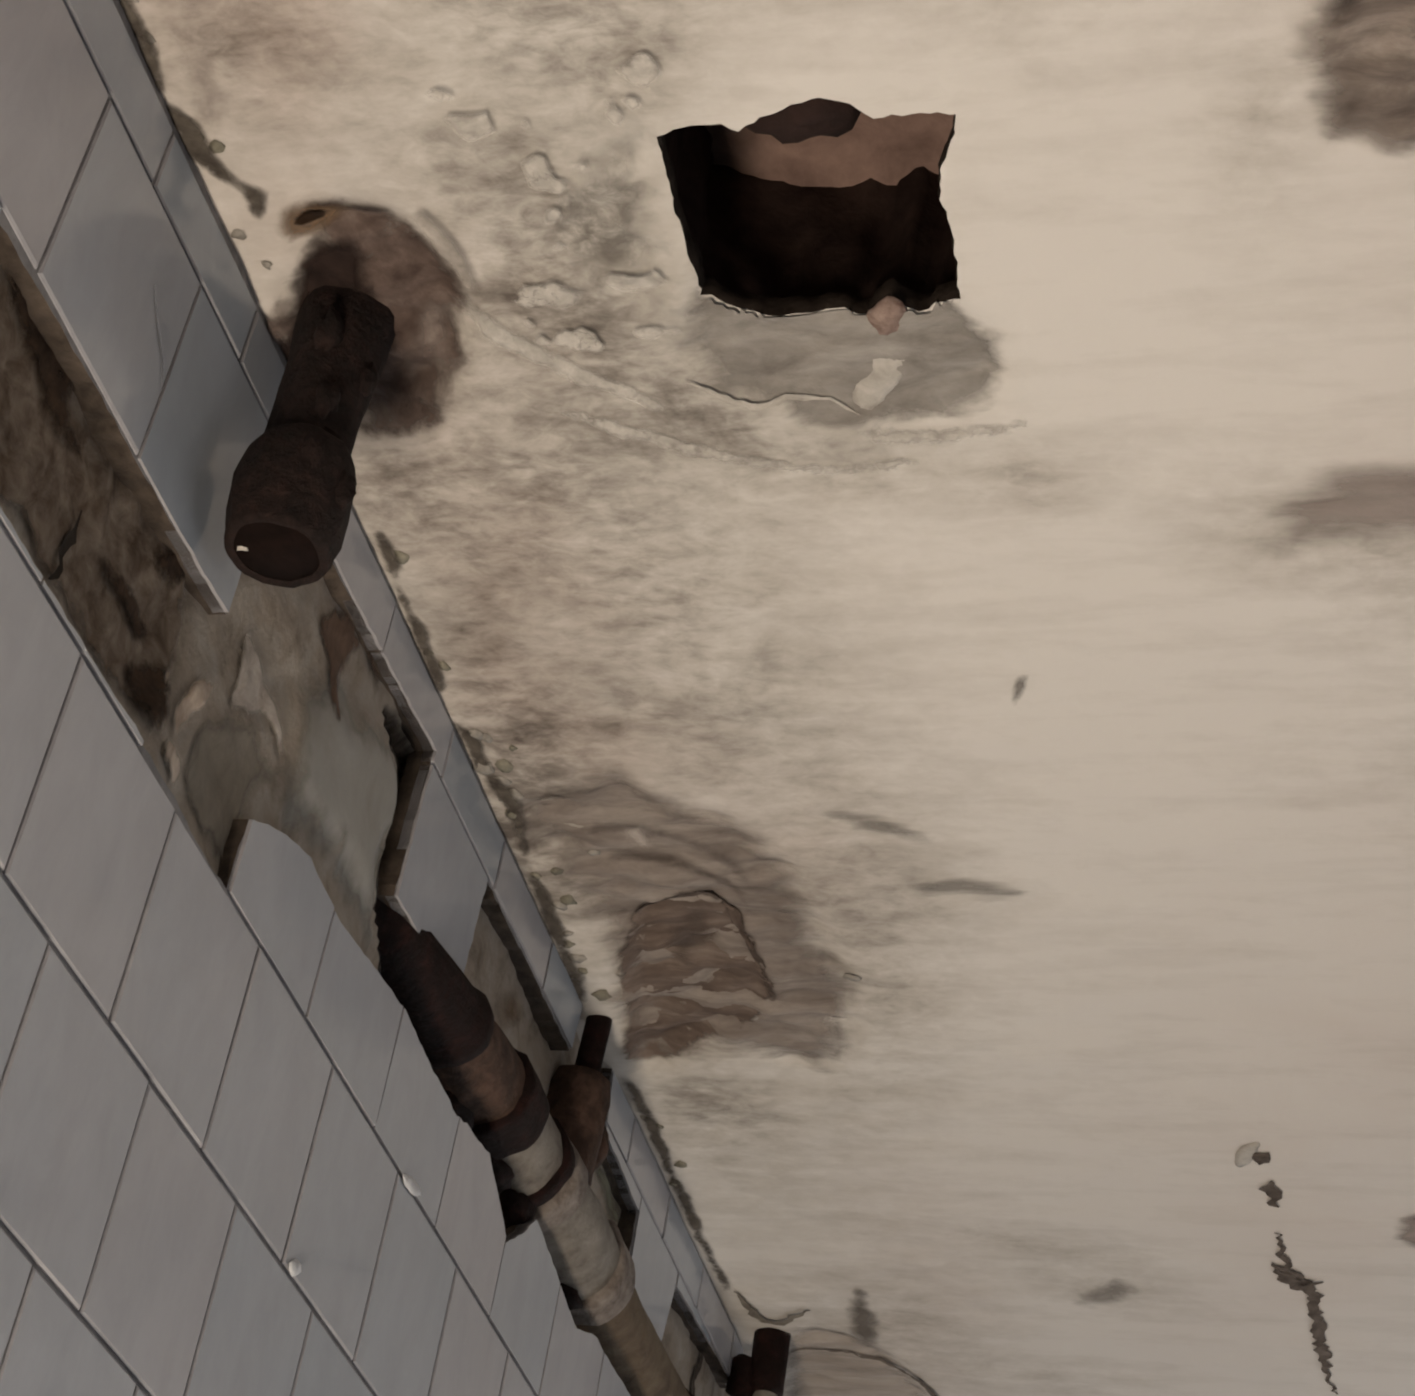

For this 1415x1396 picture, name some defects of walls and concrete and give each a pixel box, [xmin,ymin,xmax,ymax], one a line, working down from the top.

flaking render [607,54,658,124]
flaking render [523,155,665,290]
flaking render [657,114,1016,470]
flaking render [572,413,854,473]
damp [1292,473,1415,528]
flaking render [165,679,214,782]
flaking render [232,636,284,754]
damp [848,817,910,834]
flaking render [530,778,861,1060]
damp [921,882,1014,894]
crack [1235,1143,1338,1395]
flaking render [734,1291,937,1396]